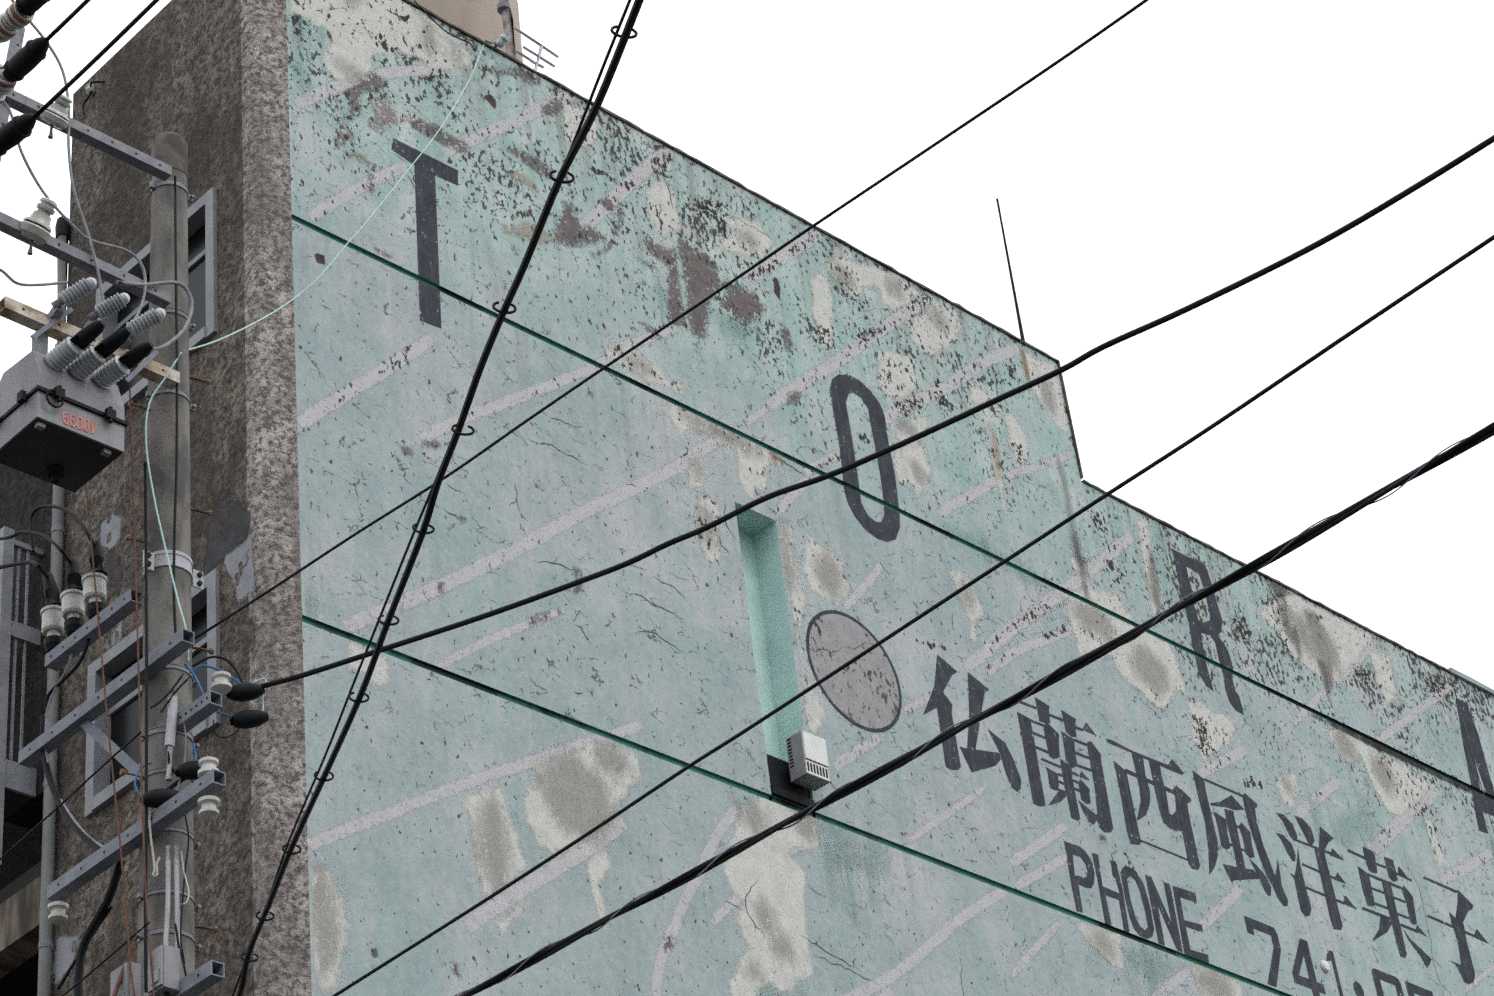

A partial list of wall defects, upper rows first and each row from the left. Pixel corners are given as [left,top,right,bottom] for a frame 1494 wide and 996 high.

peeling [490,68,540,85]
peeling [542,100,563,116]
peeling [334,74,469,191]
peeling [511,149,553,192]
peeling [642,237,780,337]